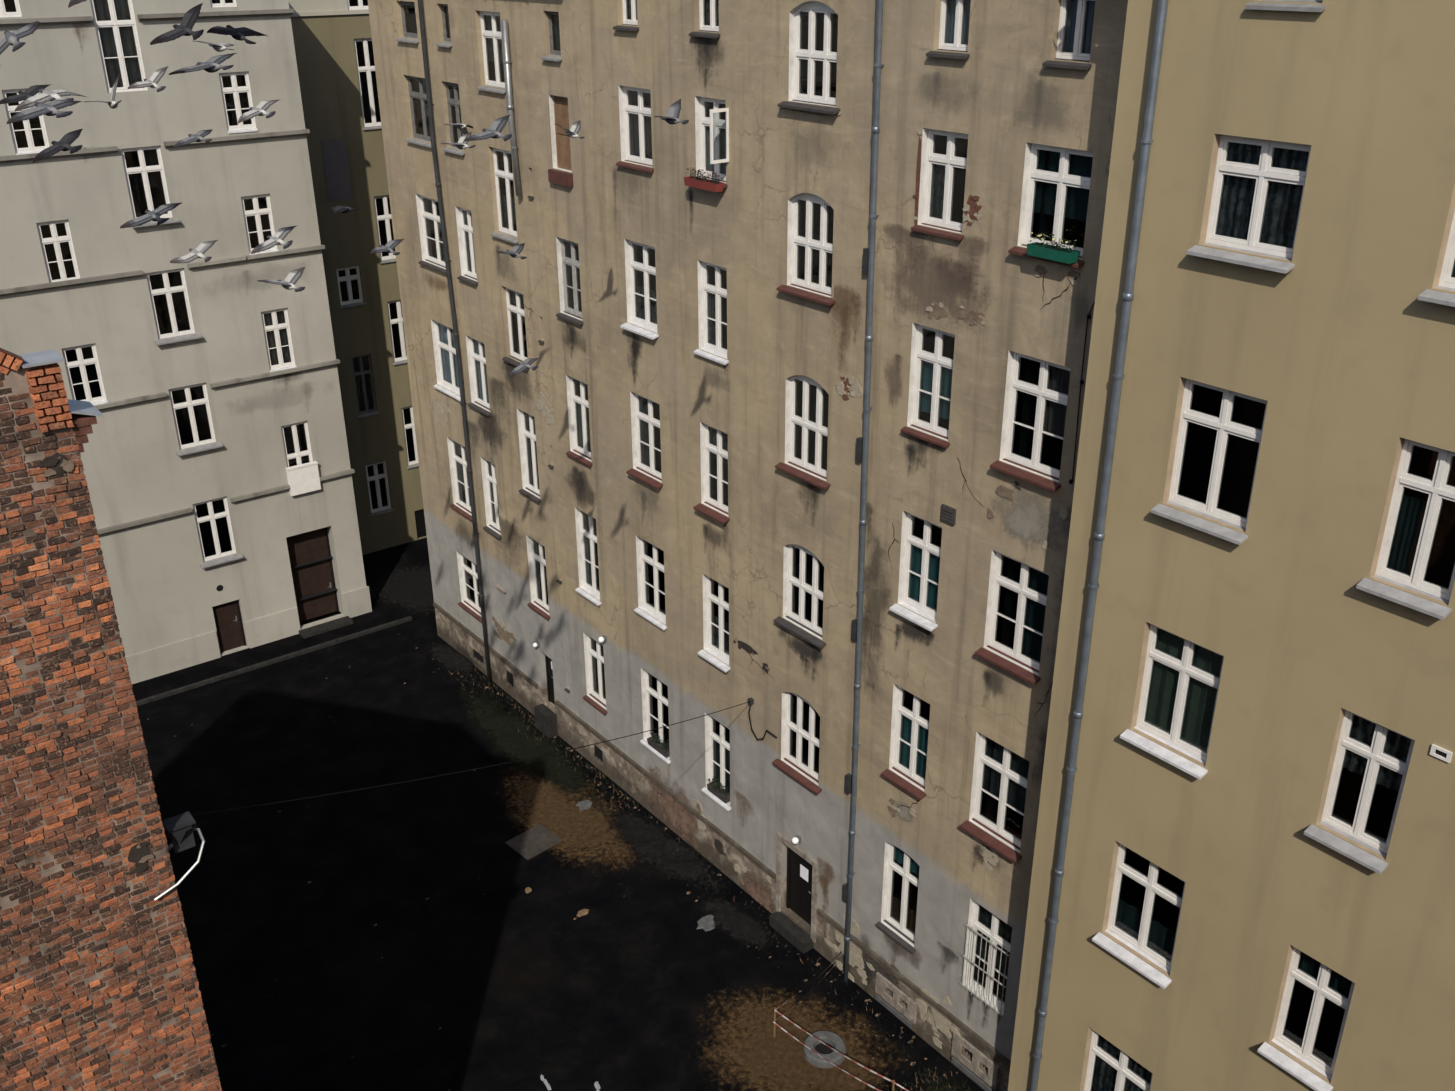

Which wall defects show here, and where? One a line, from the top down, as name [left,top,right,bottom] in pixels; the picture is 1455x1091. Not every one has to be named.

flaking render [962,195,981,225]
crack [1040,276,1077,310]
peeling [987,481,1021,519]
peeling [915,988,960,1049]